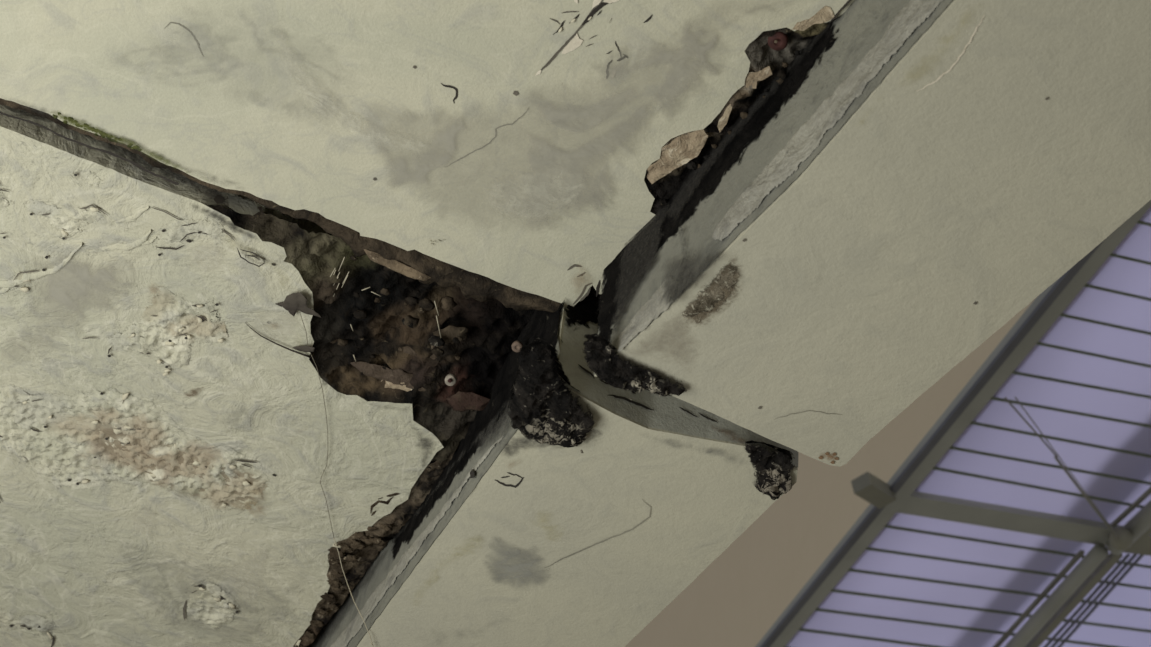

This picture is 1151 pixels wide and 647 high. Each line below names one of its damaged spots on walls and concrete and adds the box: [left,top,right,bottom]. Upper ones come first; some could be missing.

spalling [644,6,840,215]
peeling [82,287,229,376]
leakage [308,0,952,647]
peeling [614,276,683,354]
peeling [0,384,276,512]
leakage [101,429,205,492]
spalling [152,205,535,647]